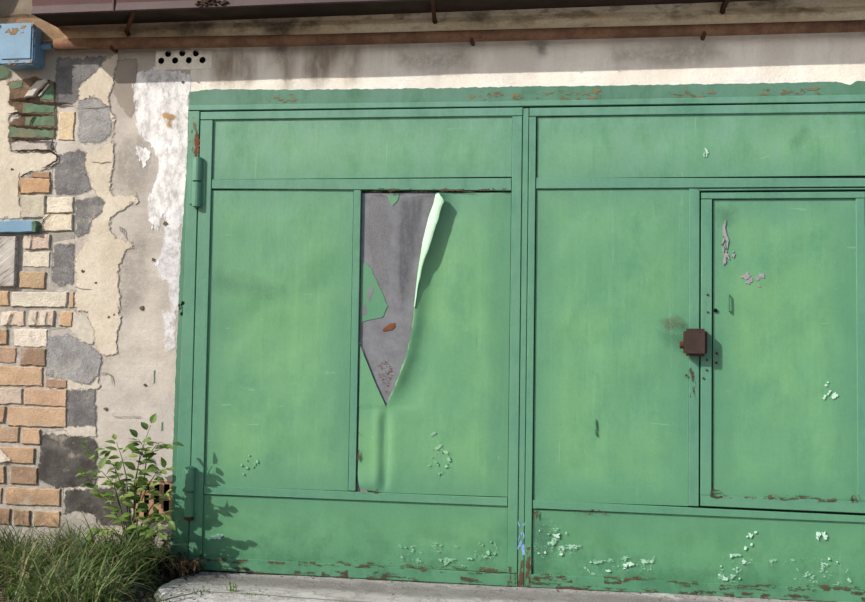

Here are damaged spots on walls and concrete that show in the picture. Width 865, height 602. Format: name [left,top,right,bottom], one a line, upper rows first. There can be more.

spalling [7,56,113,287]
peeling [132,66,197,350]
peeling [721,220,735,265]
peeling [740,272,765,287]
spalling [38,333,131,526]
rust [197,547,658,592]
peeling [432,541,496,567]
peeling [536,525,580,556]
peeling [585,556,655,575]
rust [667,581,776,599]
rust [784,584,865,602]